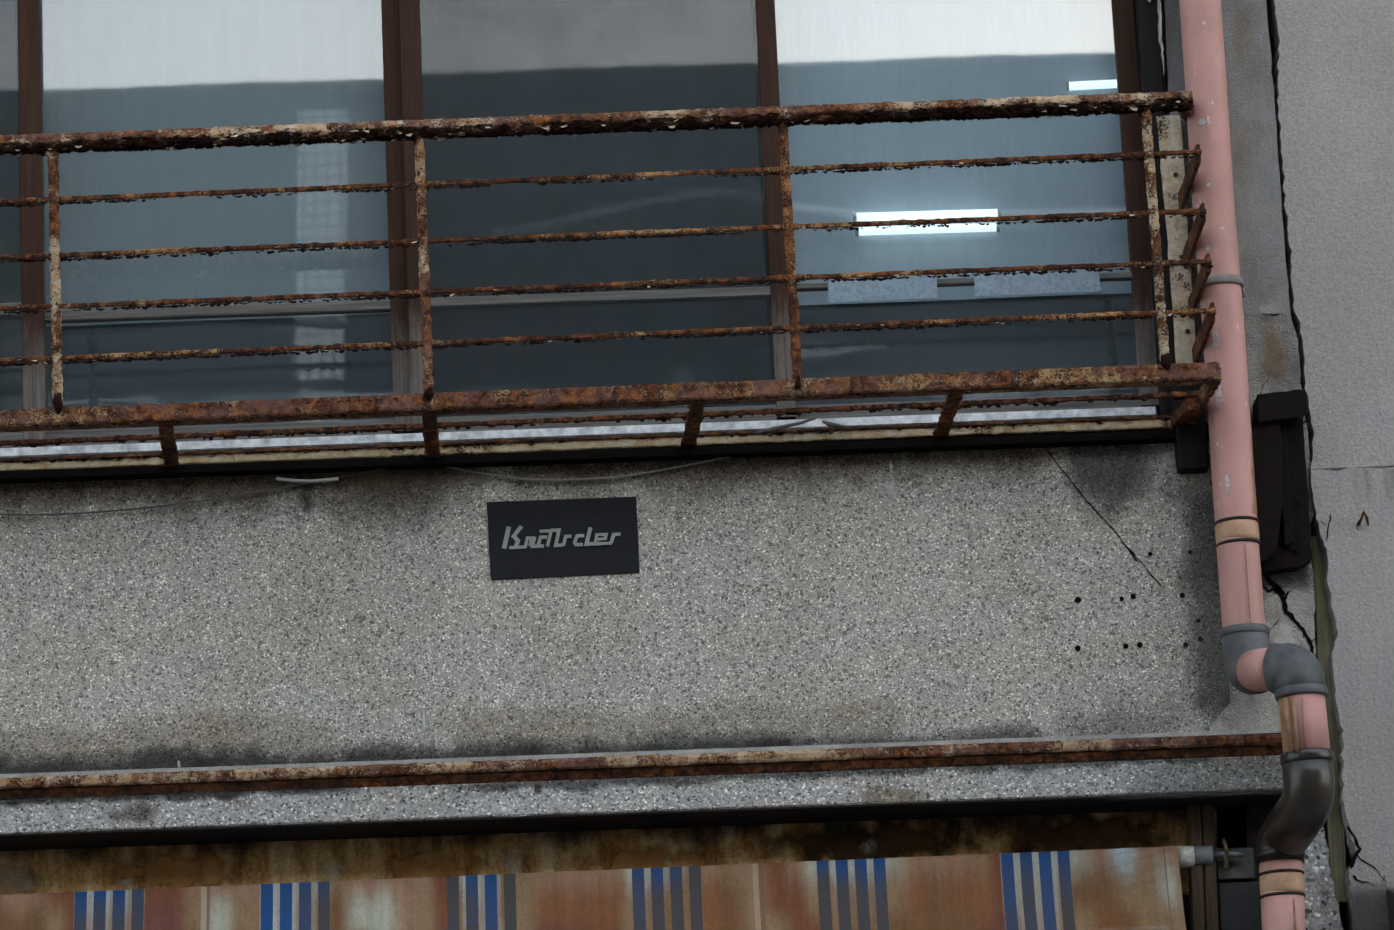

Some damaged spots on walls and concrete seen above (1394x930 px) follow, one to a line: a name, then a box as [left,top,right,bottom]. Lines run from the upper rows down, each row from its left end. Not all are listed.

corrosion [0,97,1195,184]
corrosion [0,183,233,263]
corrosion [447,212,1207,247]
corrosion [2,279,805,322]
corrosion [824,254,1217,347]
corrosion [0,337,841,464]
crack [1045,449,1163,588]
crack [1263,576,1317,658]
leakage [0,710,932,774]
leakage [956,729,1036,740]
corrosion [764,820,973,861]
corrosion [1012,813,1162,853]